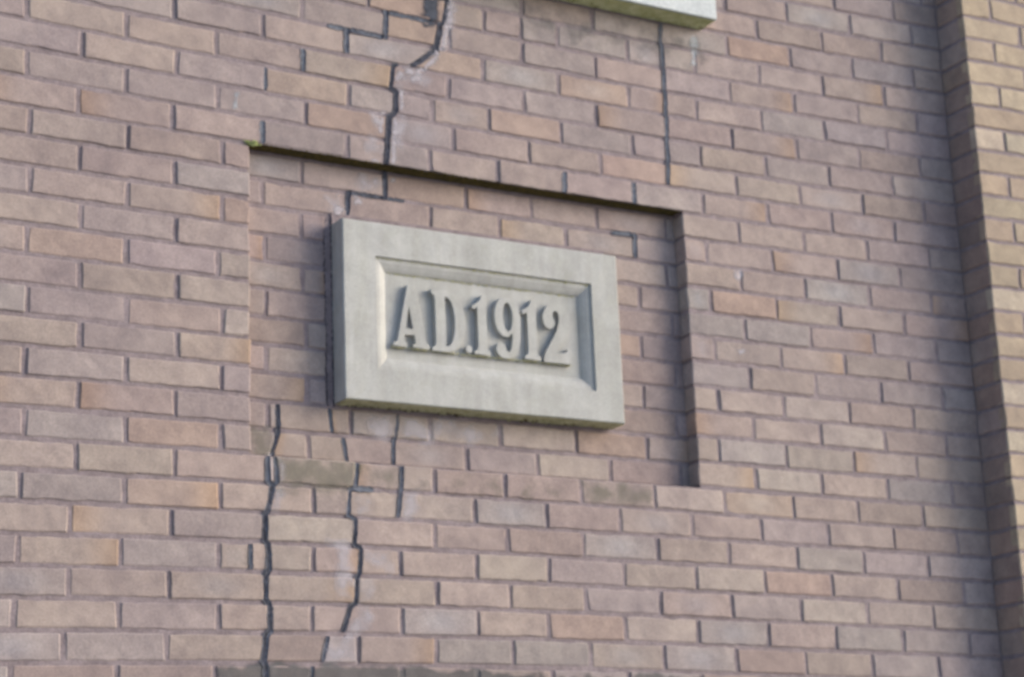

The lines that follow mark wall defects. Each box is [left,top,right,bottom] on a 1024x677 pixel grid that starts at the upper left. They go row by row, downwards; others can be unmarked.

crack [258,121,266,144]
crack [261,67,269,90]
crack [299,48,307,71]
crack [658,23,671,185]
crack [309,0,455,677]
crack [248,404,281,677]